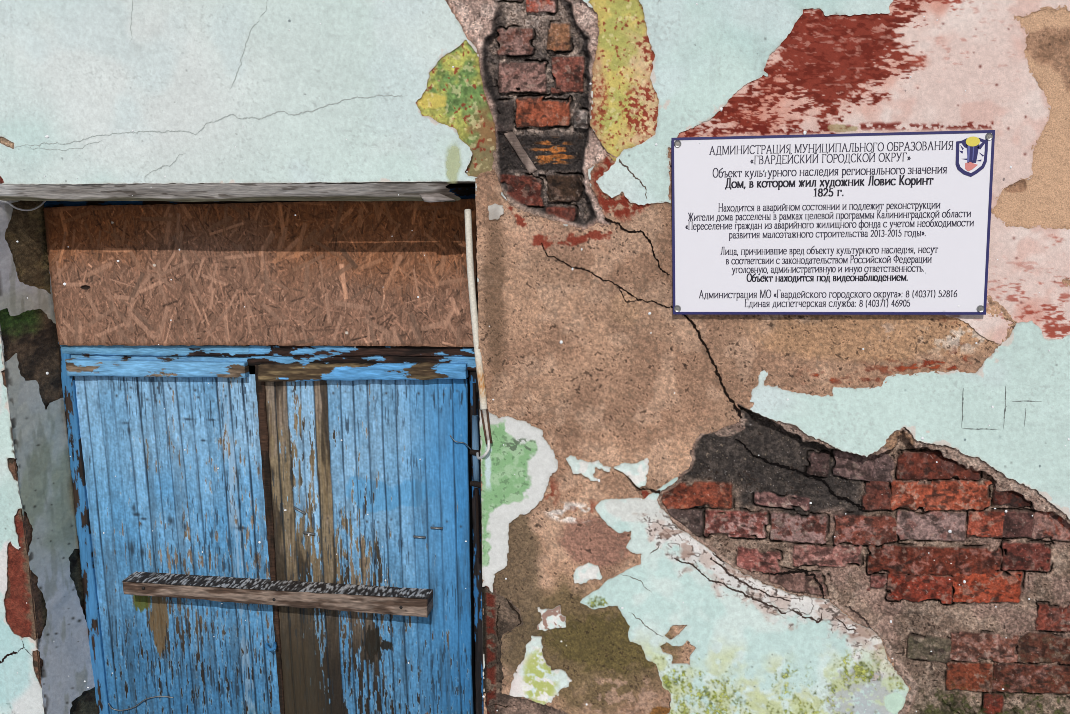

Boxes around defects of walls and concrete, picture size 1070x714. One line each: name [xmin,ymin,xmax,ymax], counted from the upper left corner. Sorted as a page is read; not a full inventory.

peeling [5,201,51,294]
crack [605,217,670,275]
peeling [0,308,63,409]
crack [541,243,865,510]
peeling [416,0,1070,714]
peeling [8,458,18,481]
peeling [4,508,47,687]
peeling [69,549,86,620]
crack [0,639,33,663]
peeling [70,687,98,714]